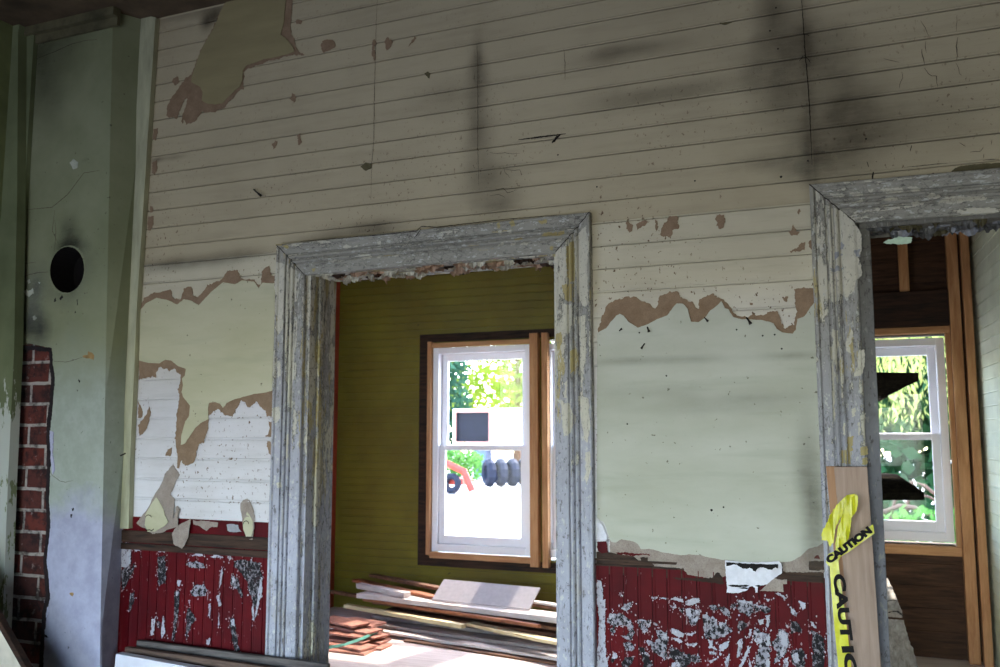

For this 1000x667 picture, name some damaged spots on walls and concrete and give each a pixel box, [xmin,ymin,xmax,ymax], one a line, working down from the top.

crack [800,1,812,158]
crack [300,54,566,242]
peeling [824,180,1000,305]
peeling [312,219,591,484]
peeling [120,542,141,612]
peeling [150,551,264,652]
peeling [596,577,828,667]